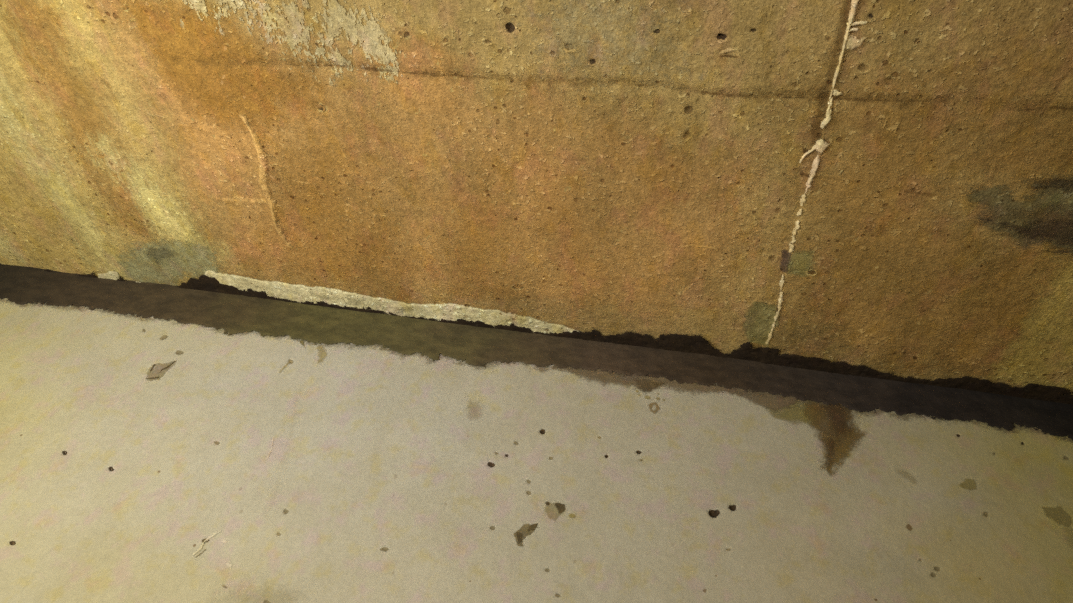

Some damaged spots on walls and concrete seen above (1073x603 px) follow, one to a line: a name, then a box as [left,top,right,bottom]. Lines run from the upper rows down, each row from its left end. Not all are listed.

crack [765,0,904,345]
leakage [799,85,1073,389]
leakage [636,380,665,413]
leakage [769,400,864,474]